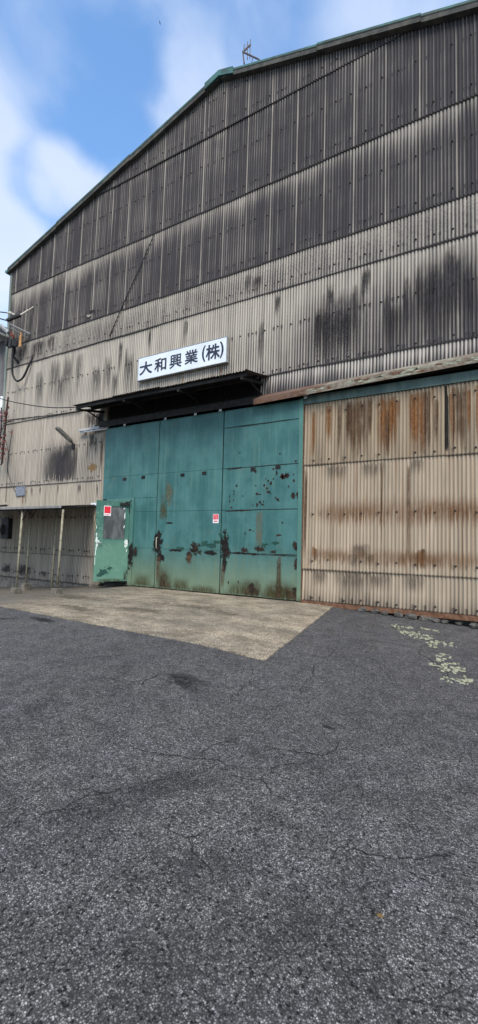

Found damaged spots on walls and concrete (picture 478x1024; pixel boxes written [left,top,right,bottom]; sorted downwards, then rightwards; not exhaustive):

water stain [315,272,370,348]
water stain [384,256,473,335]
water stain [94,345,132,389]
rust [312,386,478,454]
water stain [46,448,97,490]
rust [291,474,317,569]
rust [233,532,297,600]